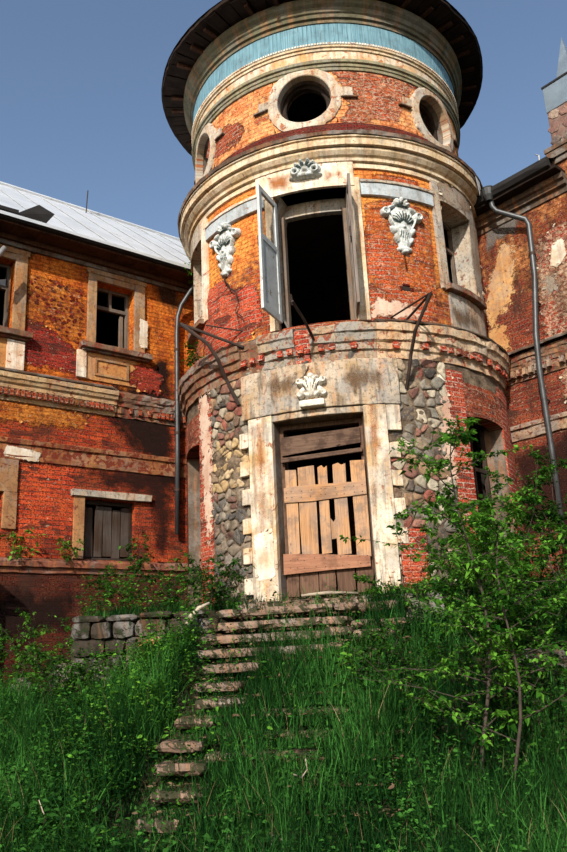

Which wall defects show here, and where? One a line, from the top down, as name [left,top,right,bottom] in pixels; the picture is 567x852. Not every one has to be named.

spalling [534,221,567,342]
water stain [115,360,174,401]
spalling [557,368,567,410]
water stain [109,416,173,458]
water stain [0,589,72,653]